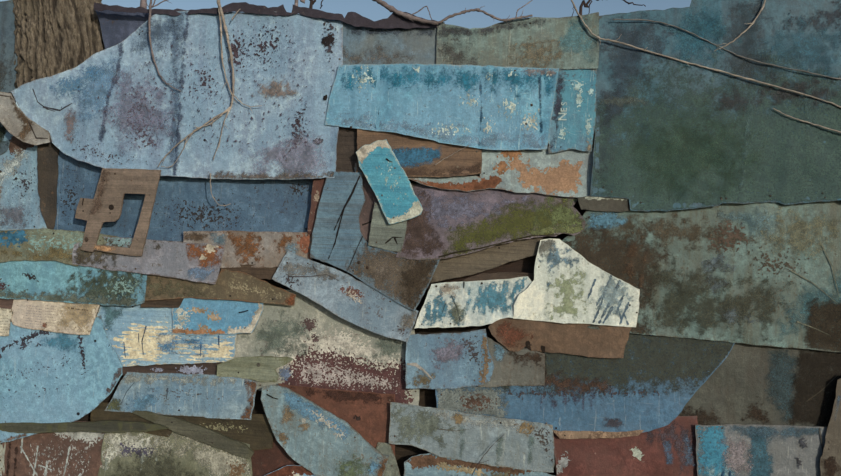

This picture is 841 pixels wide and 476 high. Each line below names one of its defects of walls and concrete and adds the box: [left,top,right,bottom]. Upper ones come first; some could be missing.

corrosion [154,187,264,268]
peeling [356,140,390,163]
peeling [376,161,422,224]
corrosion [401,191,443,257]
peeling [415,150,629,201]
corrosion [274,233,346,305]
peeling [106,280,286,374]
corrosion [298,317,321,342]
corrosion [303,207,841,448]
peeling [265,466,313,476]